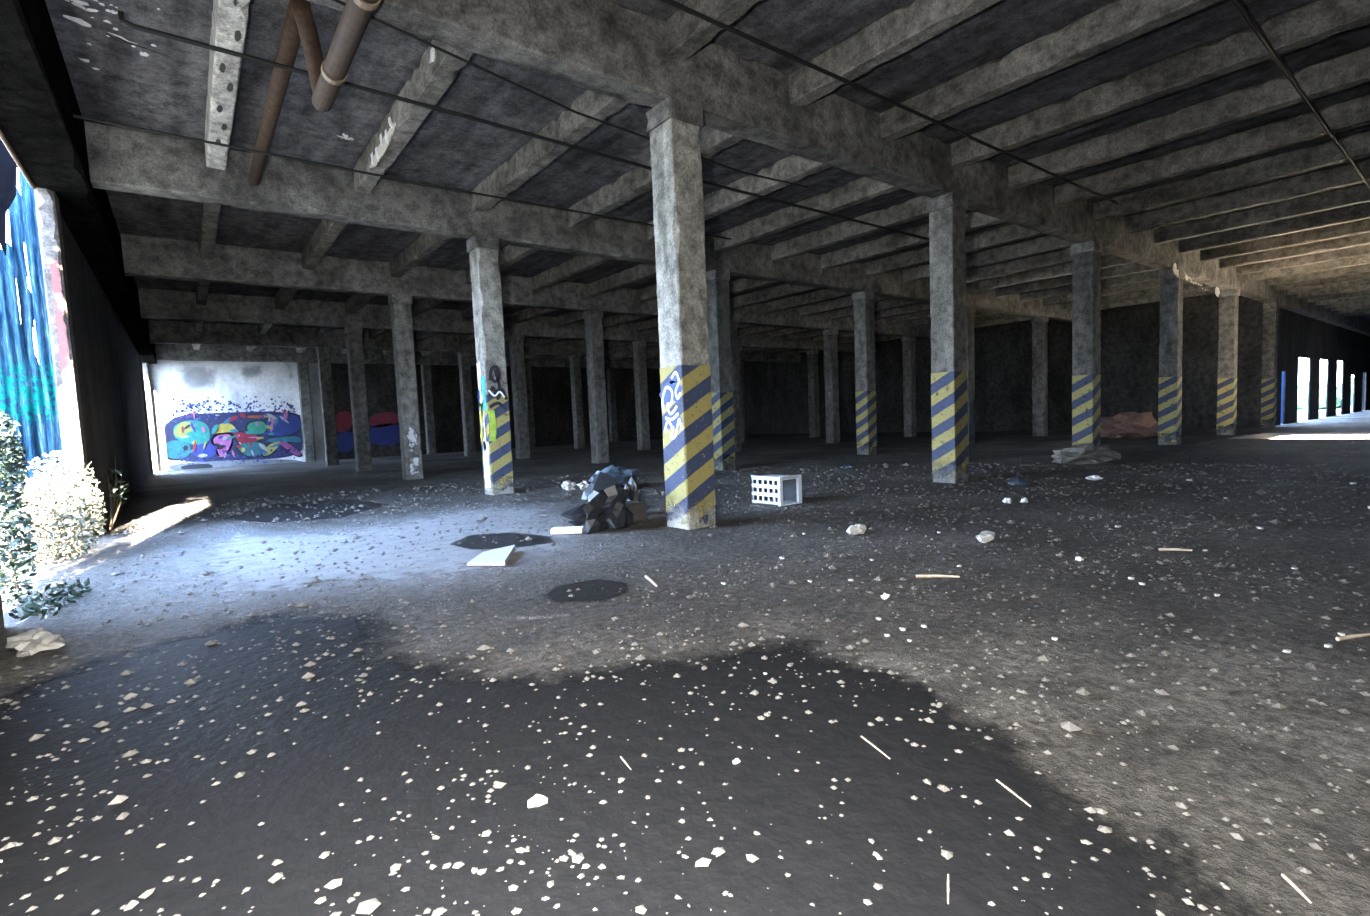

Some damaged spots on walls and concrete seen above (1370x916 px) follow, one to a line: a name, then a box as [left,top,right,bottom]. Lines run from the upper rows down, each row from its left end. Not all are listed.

peeling [63,0,118,70]